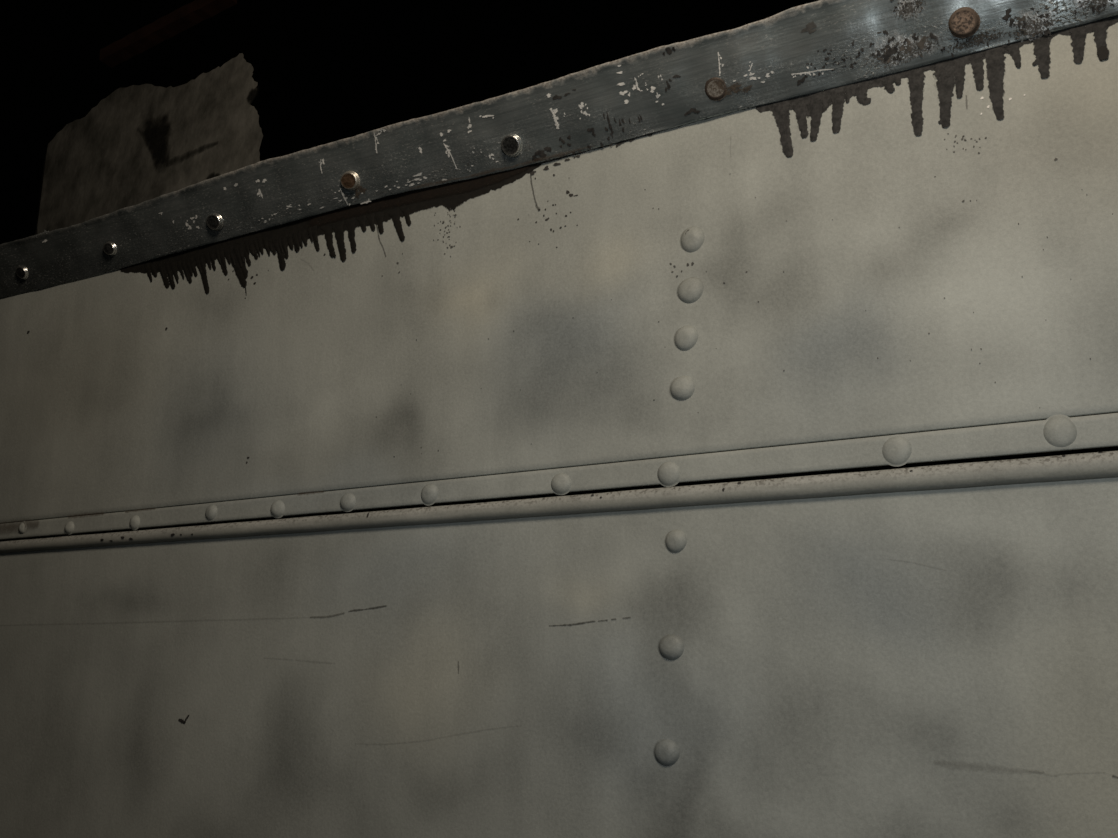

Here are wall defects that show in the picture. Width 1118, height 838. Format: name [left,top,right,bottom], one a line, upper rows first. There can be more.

leakage [772,34,1053,158]
leakage [1069,24,1109,63]
leakage [144,165,529,294]